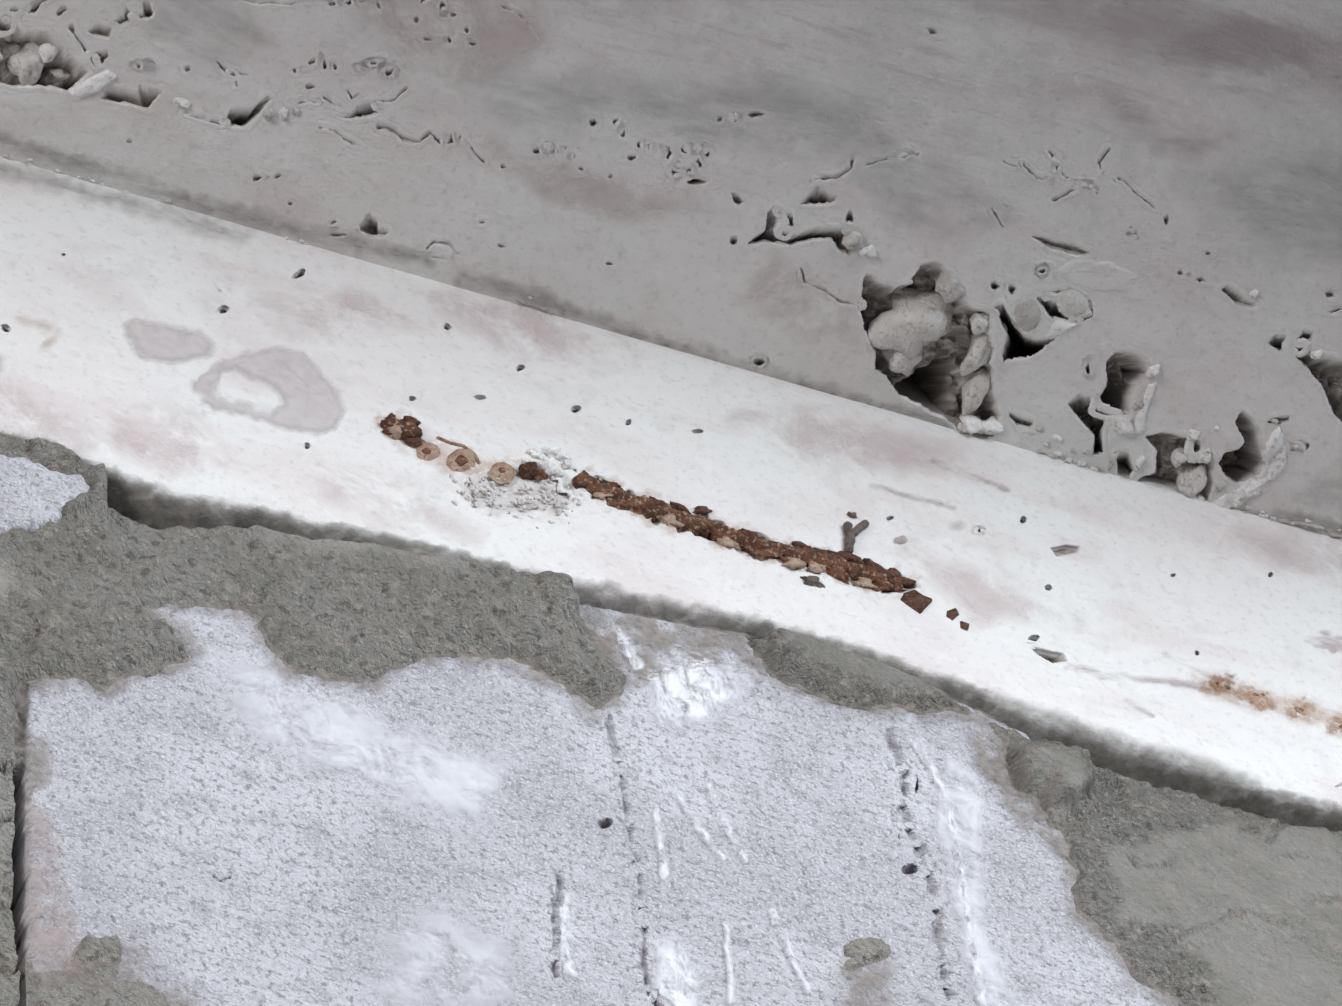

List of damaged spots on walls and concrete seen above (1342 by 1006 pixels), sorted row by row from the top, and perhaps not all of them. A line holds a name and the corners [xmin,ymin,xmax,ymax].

spalling [0,0,77,43]
spalling [66,0,168,116]
spalling [794,178,860,235]
peeling [998,142,1174,246]
spalling [985,229,1140,337]
leakage [127,320,343,432]
rust [380,413,516,484]
spalling [1063,351,1157,481]
peeling [1207,409,1320,509]
spalling [1261,324,1319,357]
rust [1205,675,1342,733]
spalling [544,862,573,988]